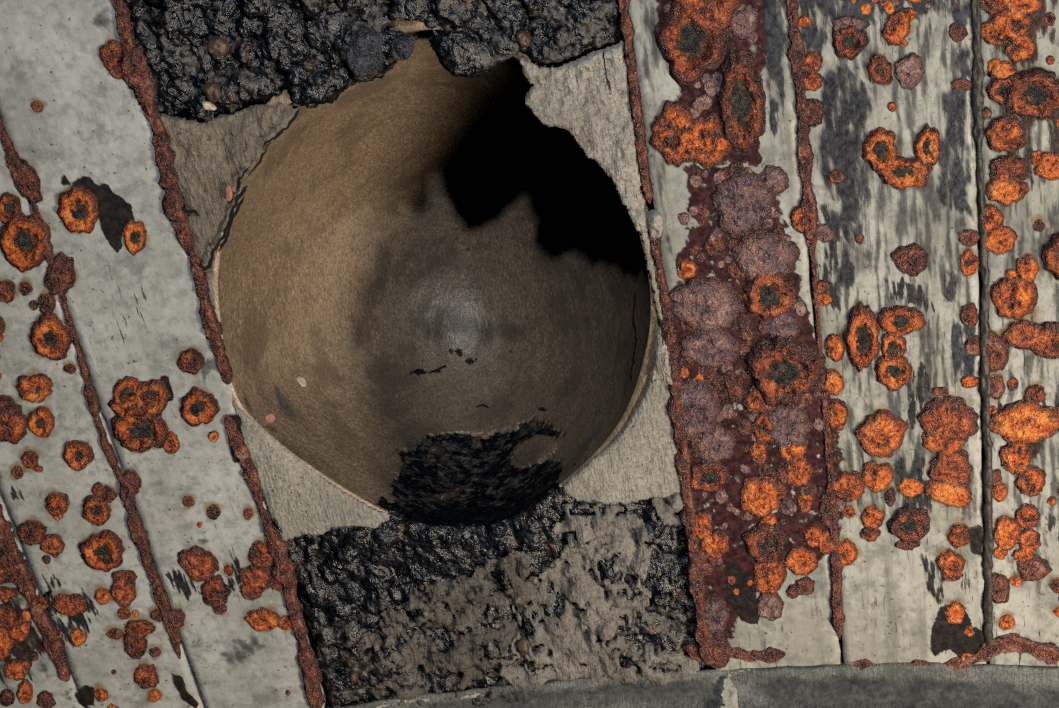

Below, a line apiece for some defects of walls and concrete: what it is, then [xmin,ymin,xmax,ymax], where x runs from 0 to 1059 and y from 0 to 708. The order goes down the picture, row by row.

water stain [764,0,788,137]
water stain [937,41,972,217]
water stain [818,66,872,314]
water stain [884,270,958,313]
corrosion [0,0,325,708]
water stain [951,323,976,377]
water stain [907,362,934,431]
peeling [513,434,558,468]
water stain [895,457,932,512]
water stain [968,526,984,555]
water stain [922,552,985,658]
peeling [173,674,200,708]